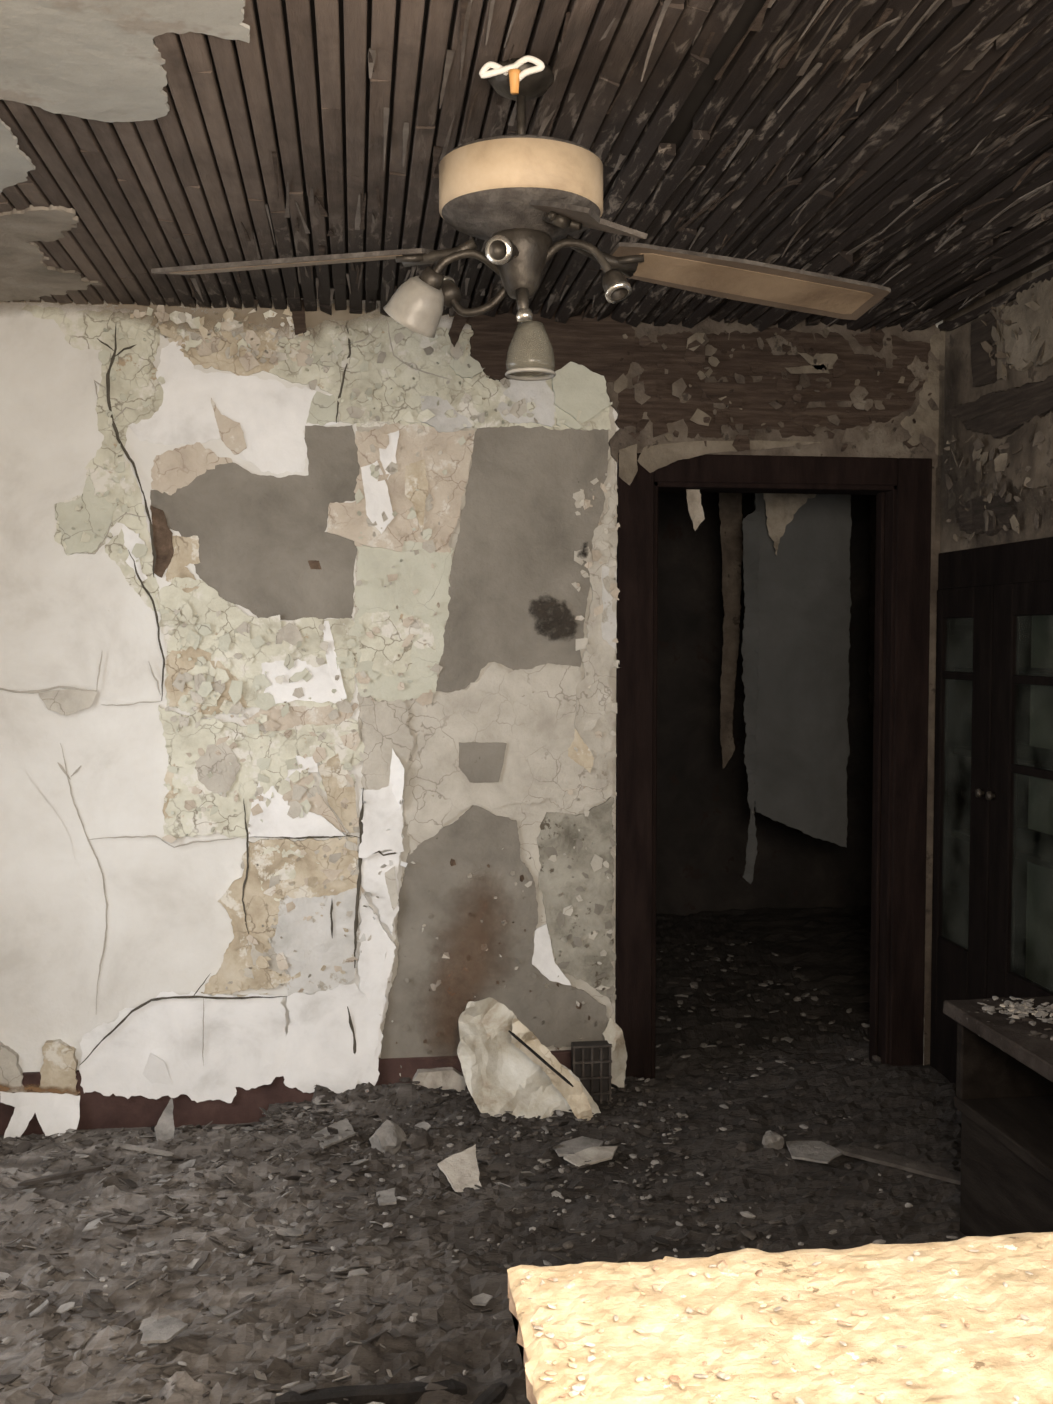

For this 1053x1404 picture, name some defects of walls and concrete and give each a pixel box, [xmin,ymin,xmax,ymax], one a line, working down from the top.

crack [0,326,165,706]
flaking render [0,277,1053,1138]
water stain [529,597,577,640]
crack [57,743,396,1066]